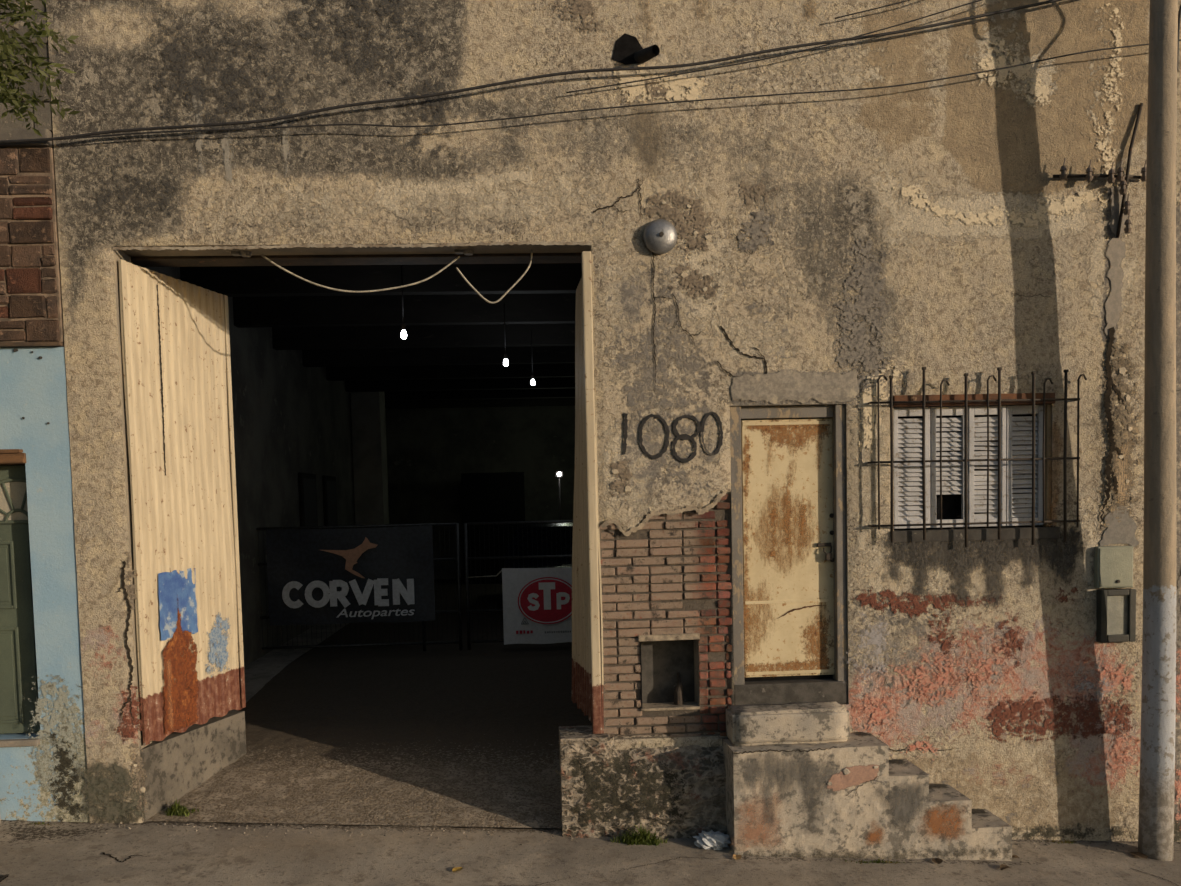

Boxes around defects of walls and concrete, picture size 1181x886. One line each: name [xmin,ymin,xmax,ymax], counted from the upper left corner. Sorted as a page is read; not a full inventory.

spalling [887,3,1132,229]
crack [593,179,643,222]
crack [652,252,767,391]
rust [742,419,829,499]
crack [1100,327,1125,529]
rust [163,598,199,735]
flaking render [599,490,733,738]
rust [743,474,833,677]
water stain [884,527,1085,606]
spalling [849,586,1142,779]
water stain [745,756,837,831]
water stain [887,786,923,826]